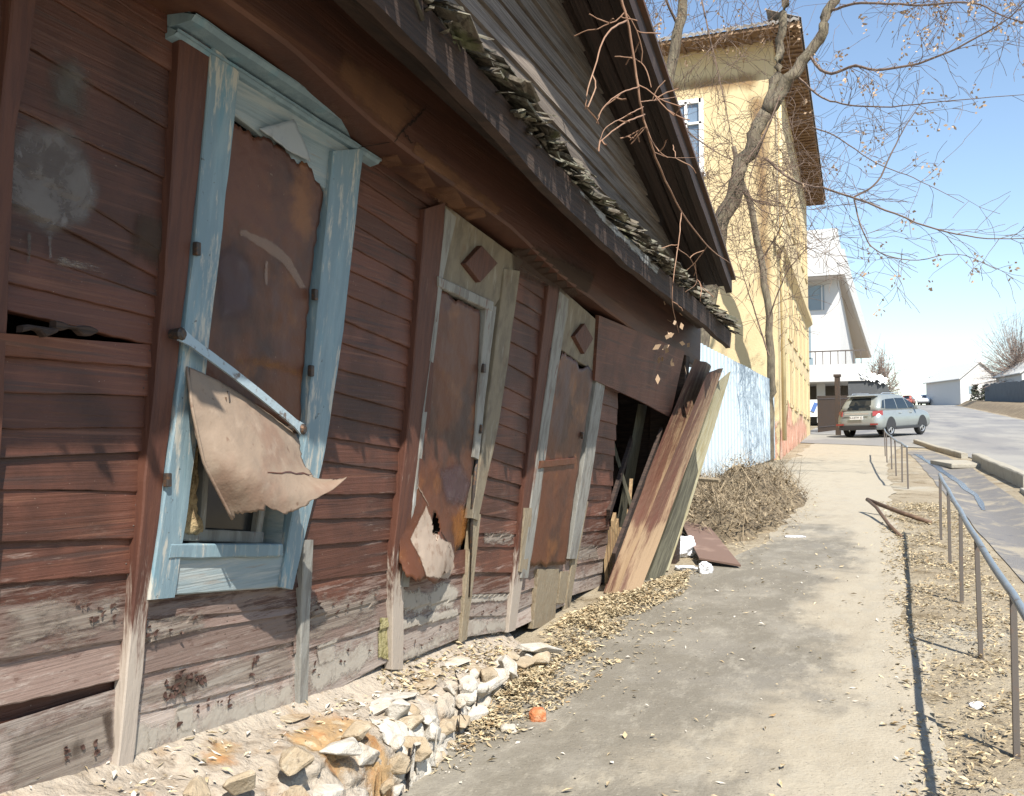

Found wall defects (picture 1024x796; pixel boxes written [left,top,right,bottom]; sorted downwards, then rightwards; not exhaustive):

damp [12,130,95,230]